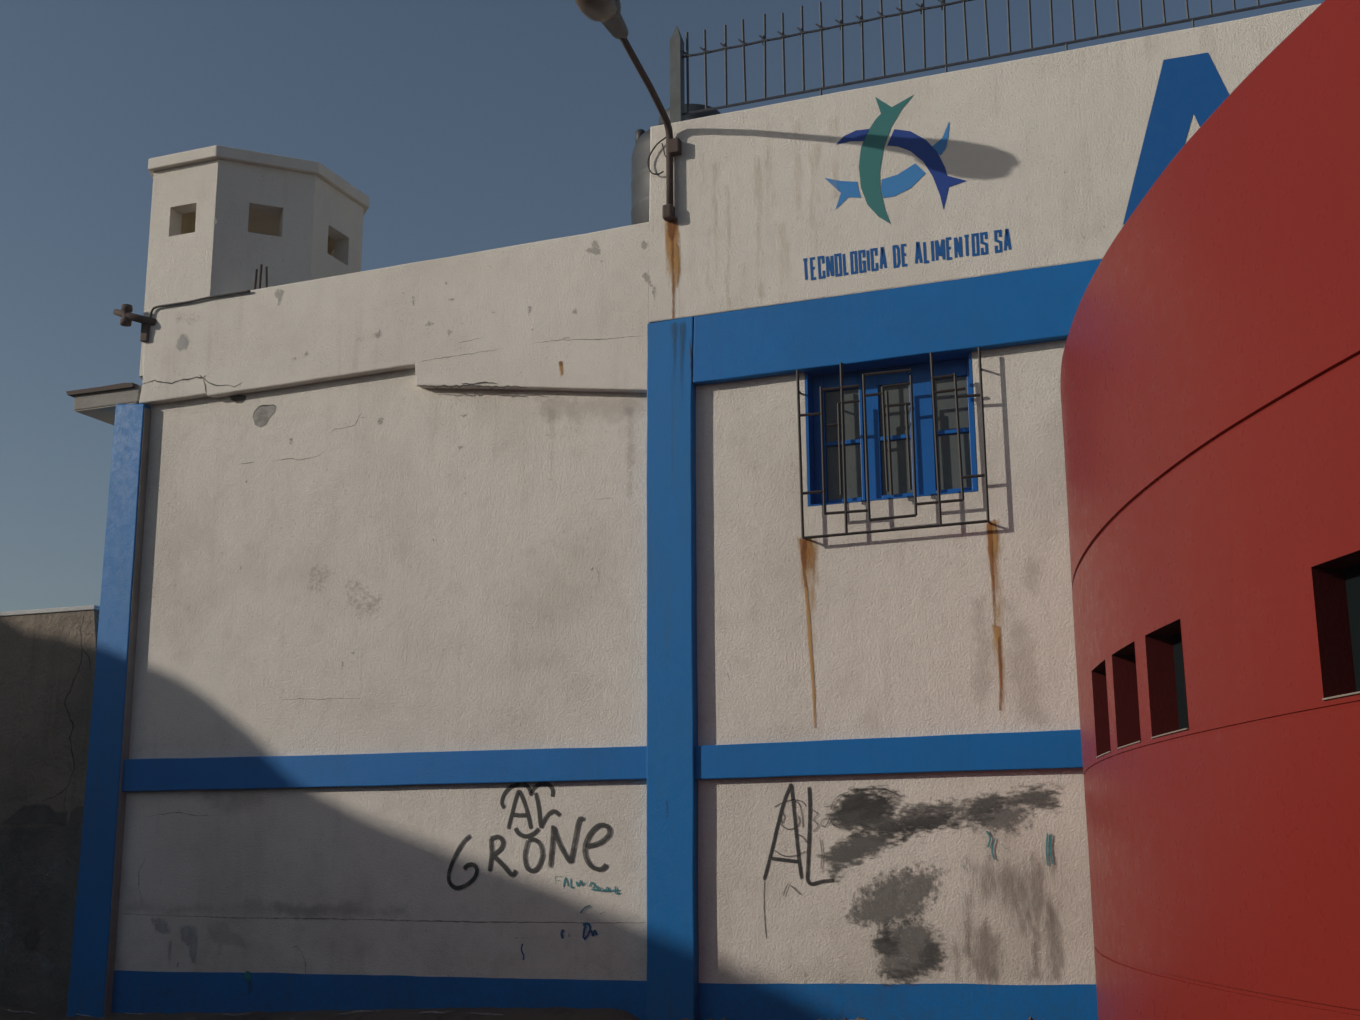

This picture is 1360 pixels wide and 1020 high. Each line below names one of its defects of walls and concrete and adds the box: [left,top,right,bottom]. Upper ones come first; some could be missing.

rust [665,218,679,318]
crack [141,376,241,393]
rust [800,539,816,728]
rust [987,520,1002,710]